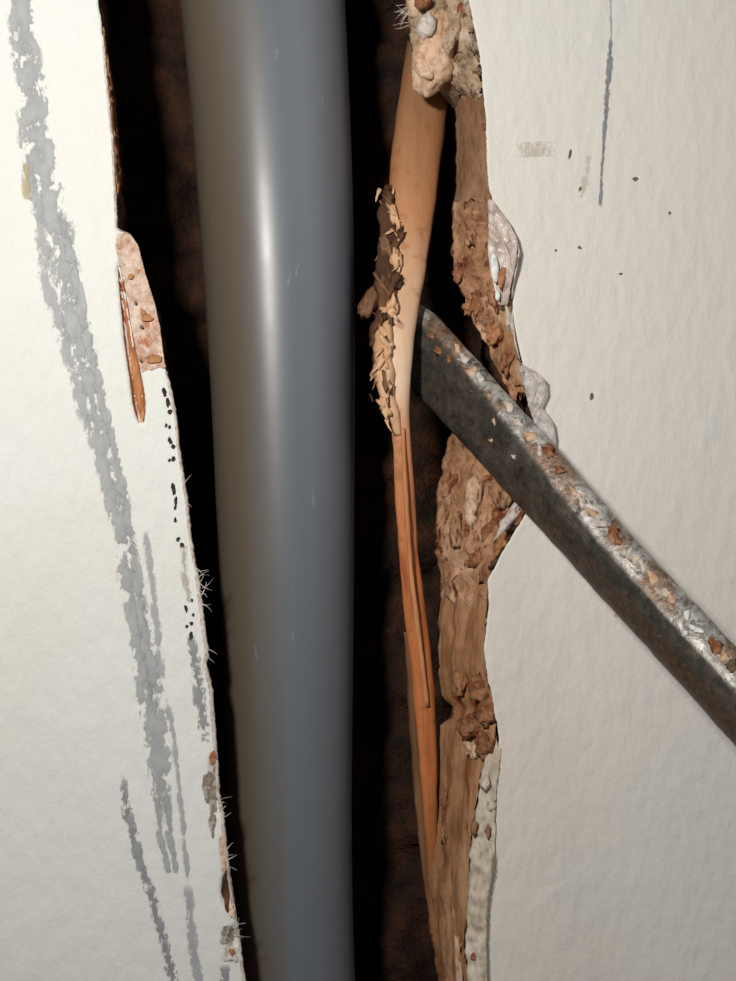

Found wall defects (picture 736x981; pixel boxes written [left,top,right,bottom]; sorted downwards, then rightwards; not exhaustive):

flaking render [102,26,122,196]
flaking render [115,233,166,422]
peeling [370,186,406,421]
spalling [396,0,556,446]
leakage [8,0,189,876]
leakage [187,637,209,741]
spalling [424,432,525,981]
leakage [121,783,178,981]
leakage [184,891,202,981]
spalling [202,750,237,963]